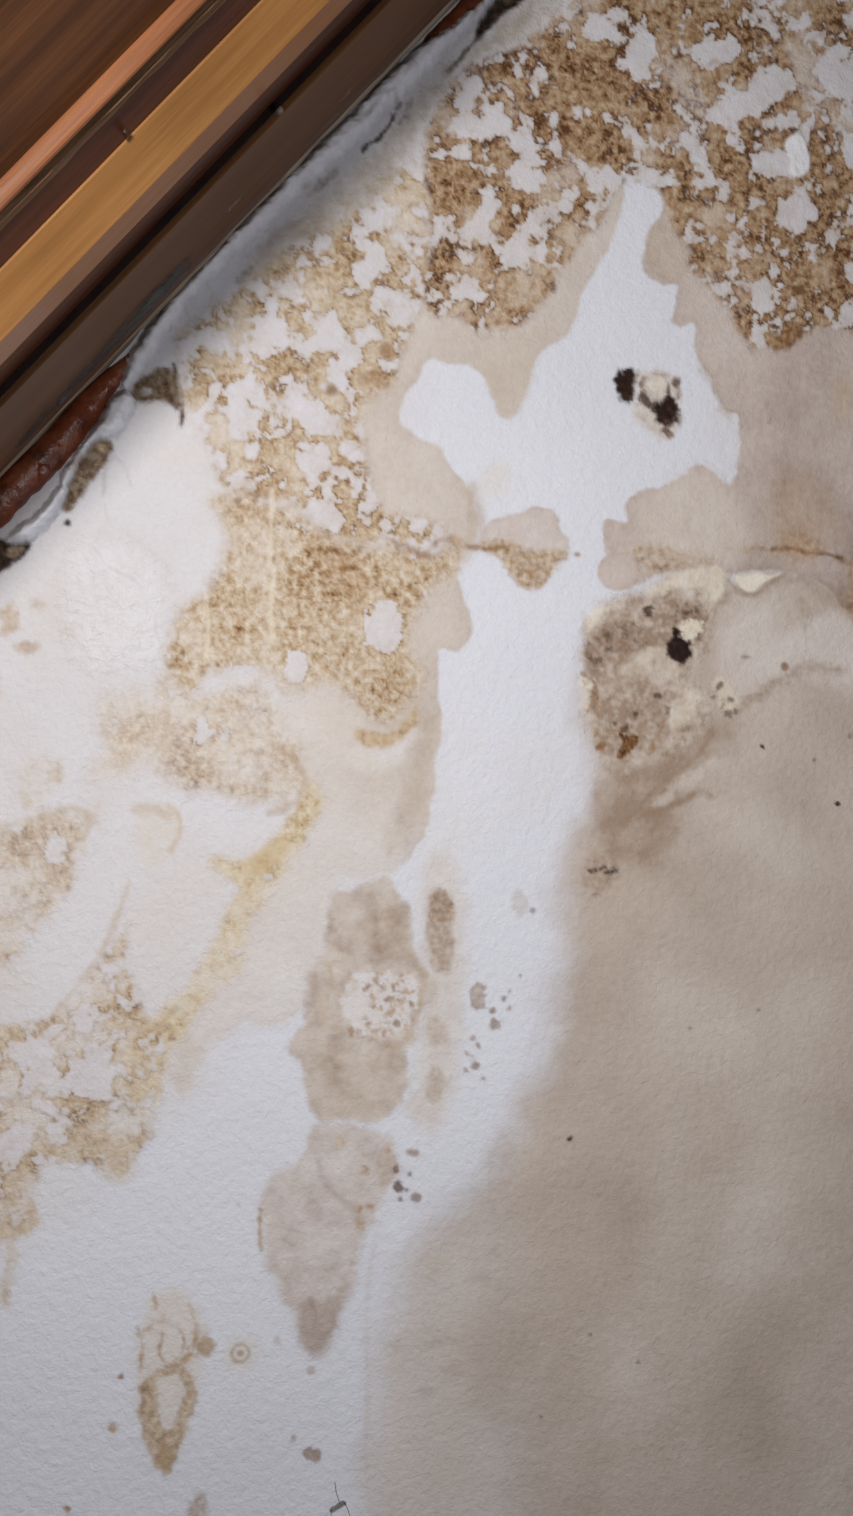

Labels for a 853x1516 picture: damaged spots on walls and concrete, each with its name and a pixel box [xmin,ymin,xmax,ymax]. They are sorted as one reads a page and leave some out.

flaking render [60,443,112,529]
peeling [0,475,472,1216]
peeling [131,0,853,547]
water stain [168,189,853,1516]
flaking render [559,555,791,777]
water stain [125,1281,219,1480]